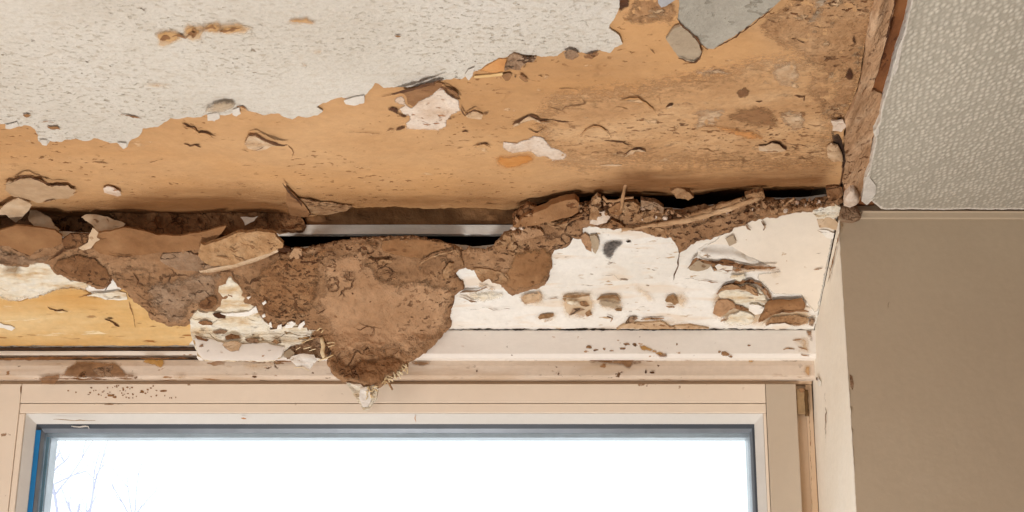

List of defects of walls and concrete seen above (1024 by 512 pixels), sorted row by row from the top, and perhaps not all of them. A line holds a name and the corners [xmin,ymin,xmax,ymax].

peeling [0,0,908,410]